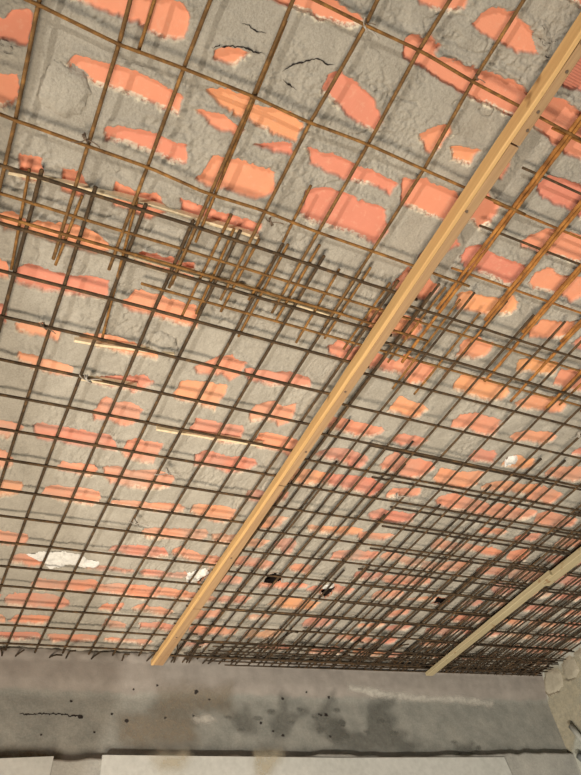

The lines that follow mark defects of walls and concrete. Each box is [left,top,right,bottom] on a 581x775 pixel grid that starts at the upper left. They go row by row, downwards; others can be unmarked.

spalling [532,19,559,61]
spalling [170,114,581,697]
water stain [317,686,493,748]